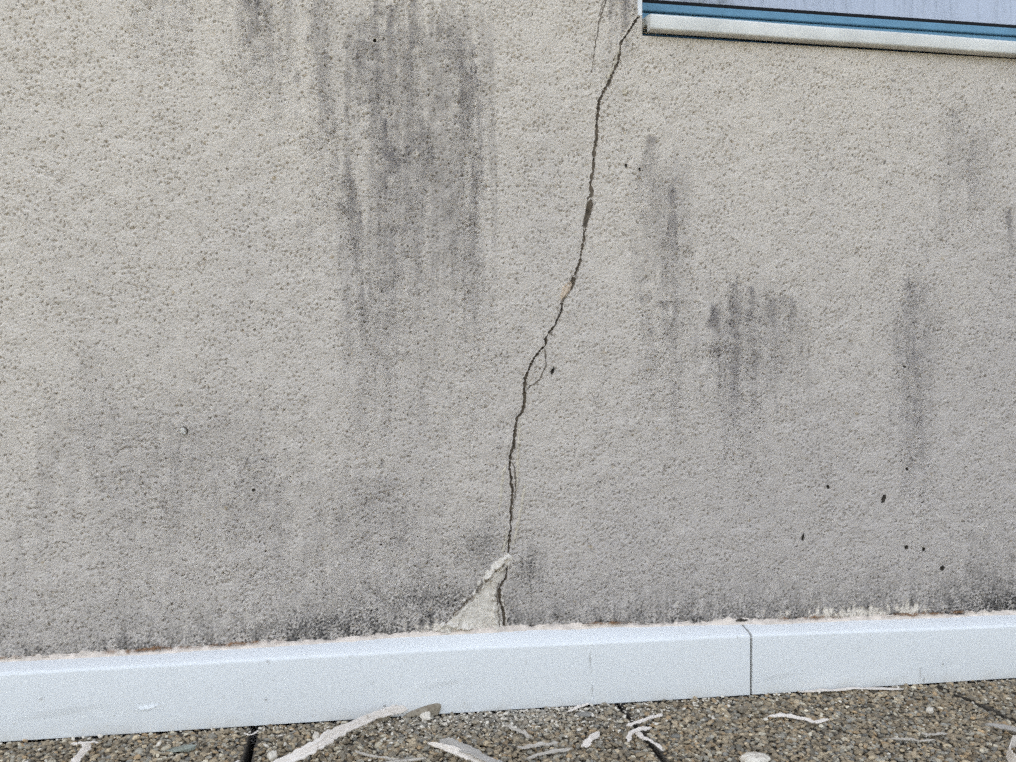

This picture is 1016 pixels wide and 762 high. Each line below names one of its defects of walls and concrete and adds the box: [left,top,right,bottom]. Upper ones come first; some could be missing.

crack [445,0,640,627]
water stain [103,593,450,651]
water stain [573,605,815,626]
water stain [928,578,1016,614]